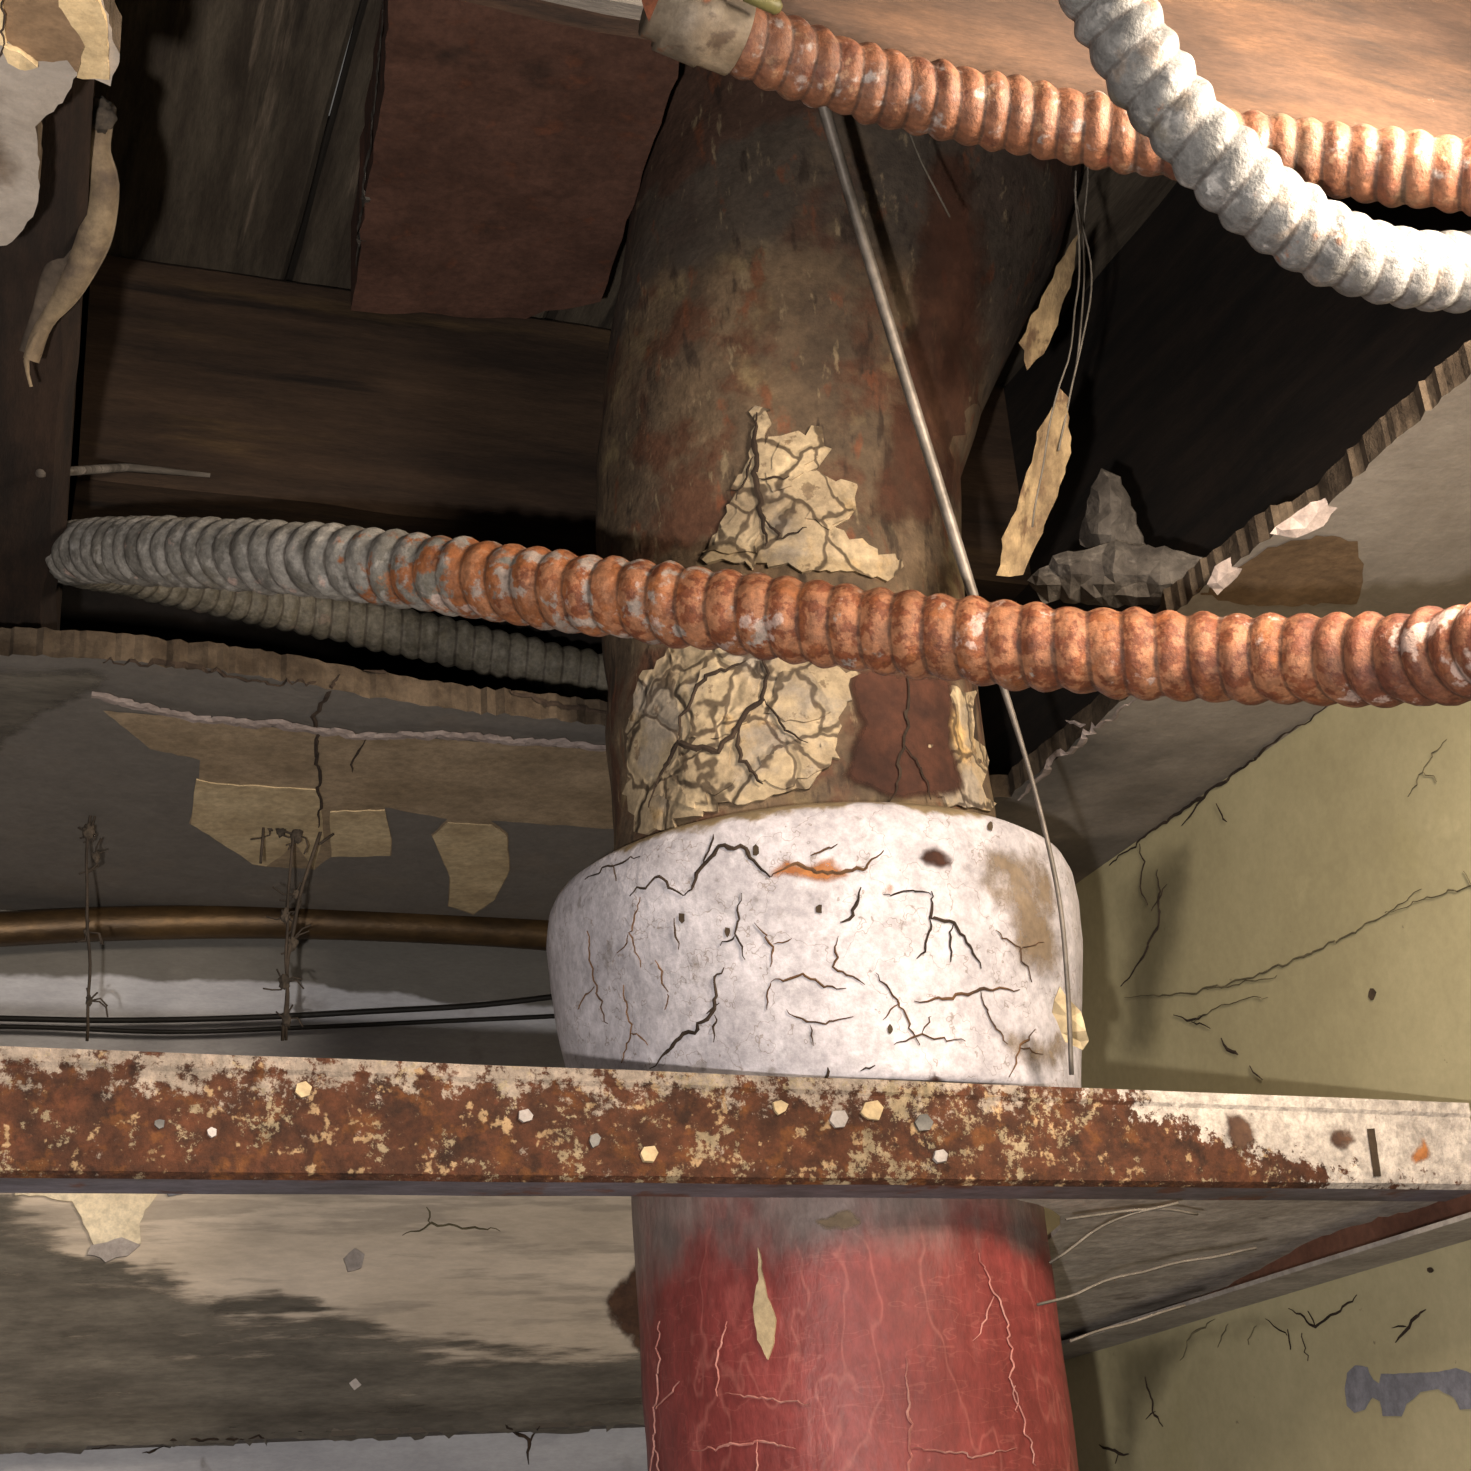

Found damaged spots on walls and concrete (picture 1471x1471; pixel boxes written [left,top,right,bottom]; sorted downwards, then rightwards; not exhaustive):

flaking render [0,0,120,387]
corrosion [878,157,988,522]
peeling [701,405,904,583]
peeling [996,389,1071,577]
peeling [1195,498,1364,607]
crack [103,657,387,828]
peeling [91,646,861,915]
crack [578,834,1044,1078]
crack [1109,706,1471,1080]
corrosion [1228,1115,1255,1149]
damp [0,1194,644,1455]
crack [650,1321,796,1471]